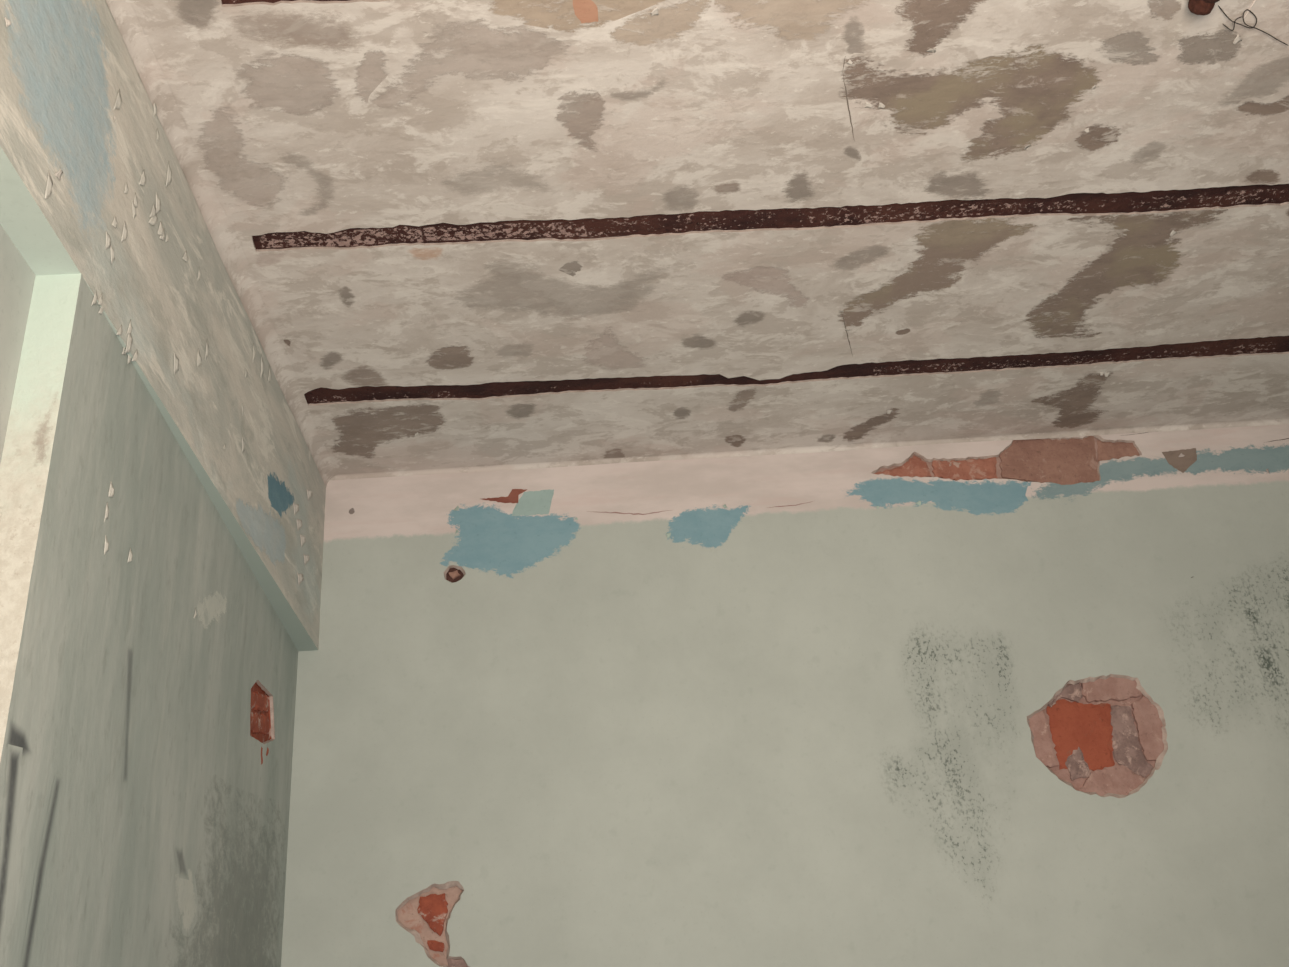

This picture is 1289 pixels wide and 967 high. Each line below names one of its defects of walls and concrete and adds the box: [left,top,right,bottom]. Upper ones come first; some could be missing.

corrosion [403,245,451,263]
peeling [837,369,1289,520]
peeling [435,489,585,583]
peeling [660,500,754,554]
water stain [1147,541,1289,754]
flaking render [250,680,275,764]
water stain [864,614,1030,931]
flaking render [1027,674,1168,798]
flaking render [395,881,469,967]